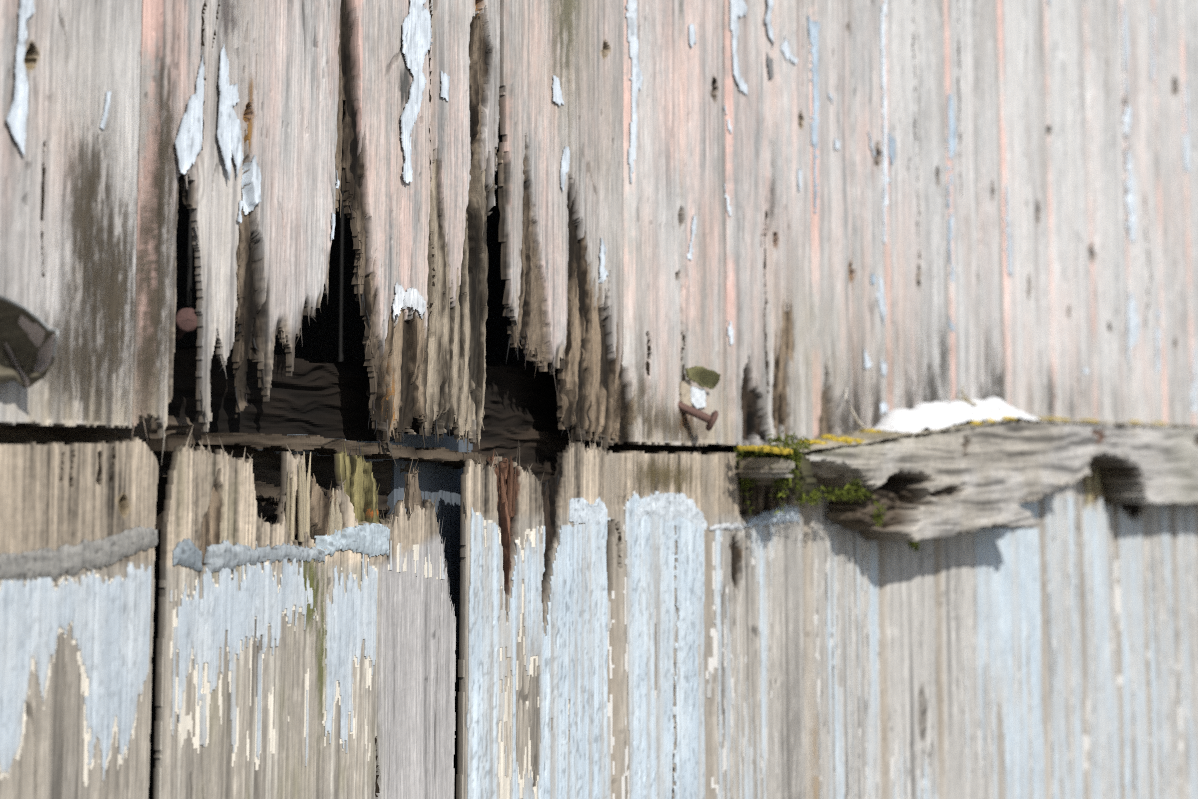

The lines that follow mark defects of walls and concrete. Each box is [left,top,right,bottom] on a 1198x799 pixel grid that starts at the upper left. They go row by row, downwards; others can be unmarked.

damp [157,73,173,222]
peeling [175,44,261,223]
peeling [400,0,450,183]
peeling [730,0,748,96]
peeling [765,0,820,213]
peeling [868,0,896,244]
peeling [0,295,58,388]
damp [49,144,168,409]
peeling [392,282,426,319]
peeling [0,525,158,787]
peeling [170,523,445,770]
peeling [466,491,802,799]